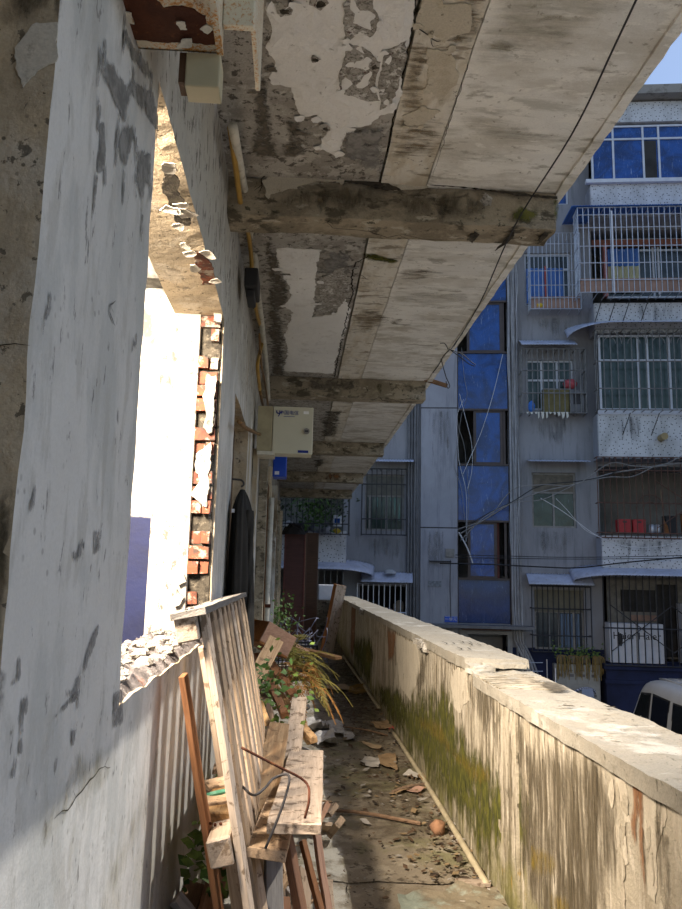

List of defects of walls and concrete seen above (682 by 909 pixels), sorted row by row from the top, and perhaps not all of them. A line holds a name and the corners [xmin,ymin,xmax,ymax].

peeling [93,11,222,285]
corrosion [123,0,215,45]
peeling [265,0,472,158]
peeling [272,247,351,374]
spalling [174,313,222,608]
leakage [472,689,495,746]
leakage [518,721,616,909]